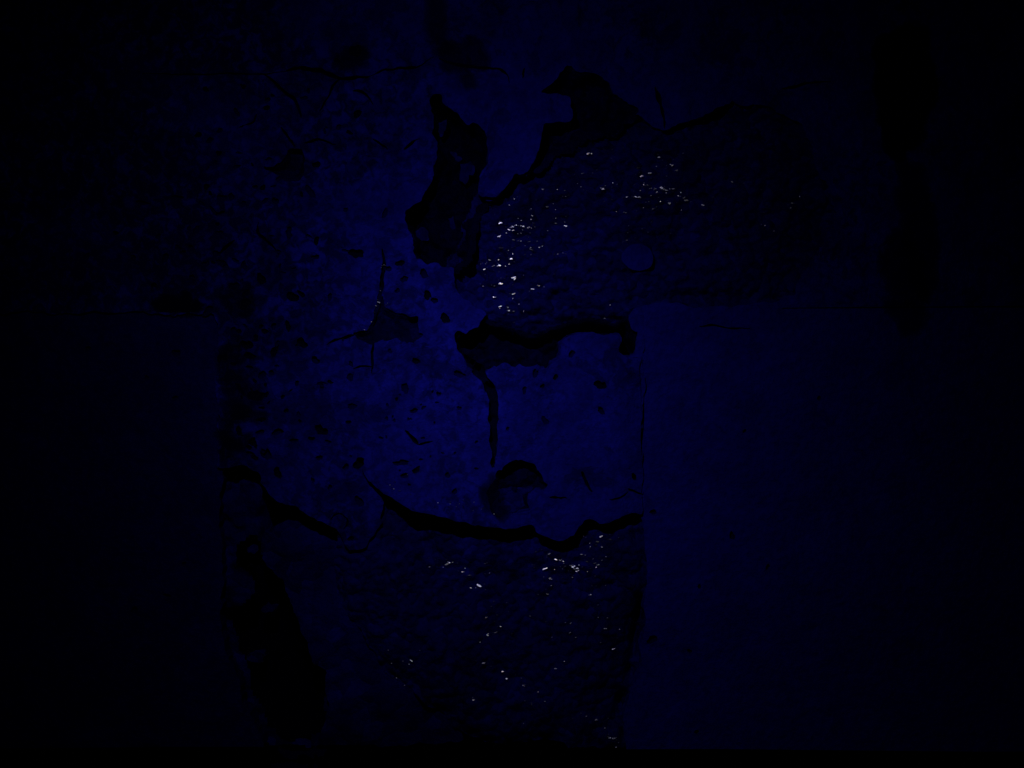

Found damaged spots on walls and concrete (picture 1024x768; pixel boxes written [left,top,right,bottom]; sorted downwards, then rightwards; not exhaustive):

spalling [342,66,834,395]
spalling [231,320,332,478]
crack [405,430,433,445]
crack [462,352,499,468]
crack [550,379,647,500]